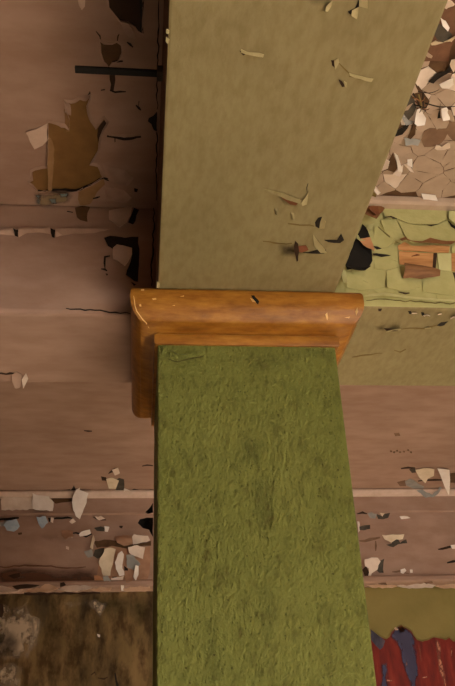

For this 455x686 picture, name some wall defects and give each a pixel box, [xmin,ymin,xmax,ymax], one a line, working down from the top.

crack [445,0,455,9]
spalling [424,0,455,89]
spalling [395,86,455,150]
peeling [0,92,144,291]
crack [331,53,455,330]
peeling [342,206,455,305]
crack [66,307,131,315]
peeling [397,467,455,498]
peeling [0,486,153,595]
peeling [357,511,413,576]
damp [0,604,37,655]
peeling [370,624,455,686]